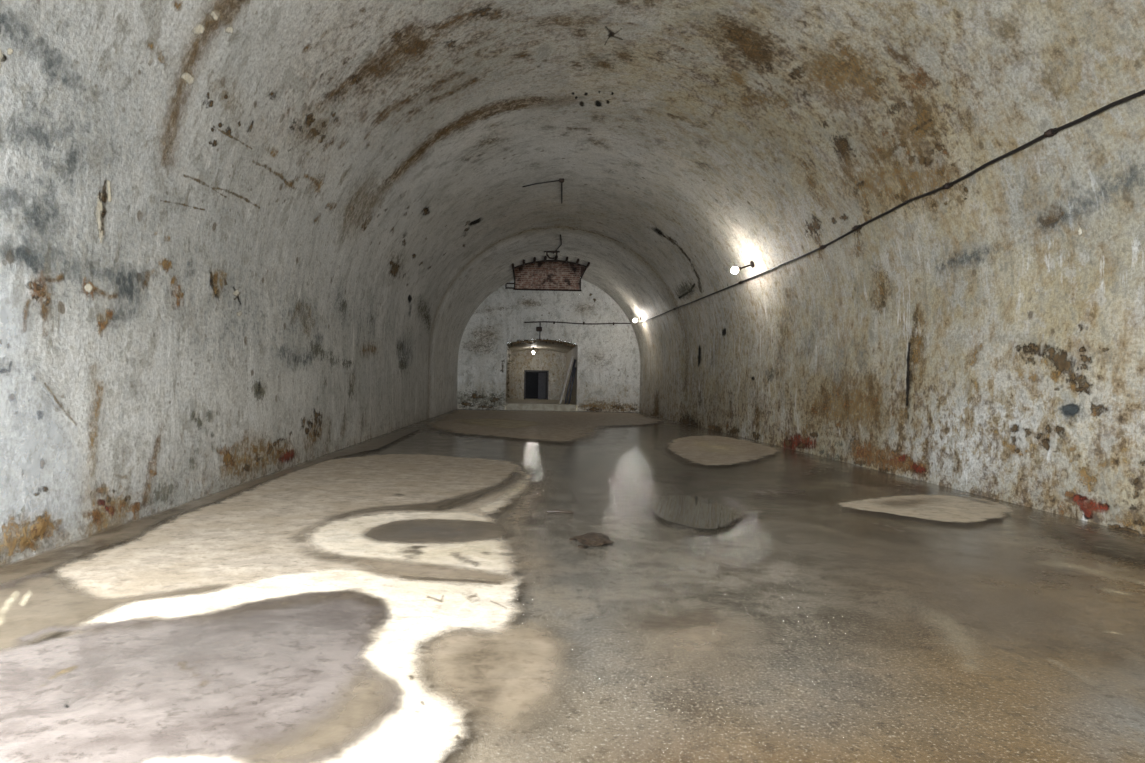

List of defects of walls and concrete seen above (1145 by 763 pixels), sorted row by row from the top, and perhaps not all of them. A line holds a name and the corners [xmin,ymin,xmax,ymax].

water stain [179,0,240,88]
water stain [290,3,502,151]
water stain [713,15,788,108]
water stain [789,40,900,115]
water stain [209,121,253,147]
water stain [819,121,856,182]
crack [870,272,891,314]
crack [893,306,925,425]
spalling [991,342,1145,536]
spalling [0,509,62,566]